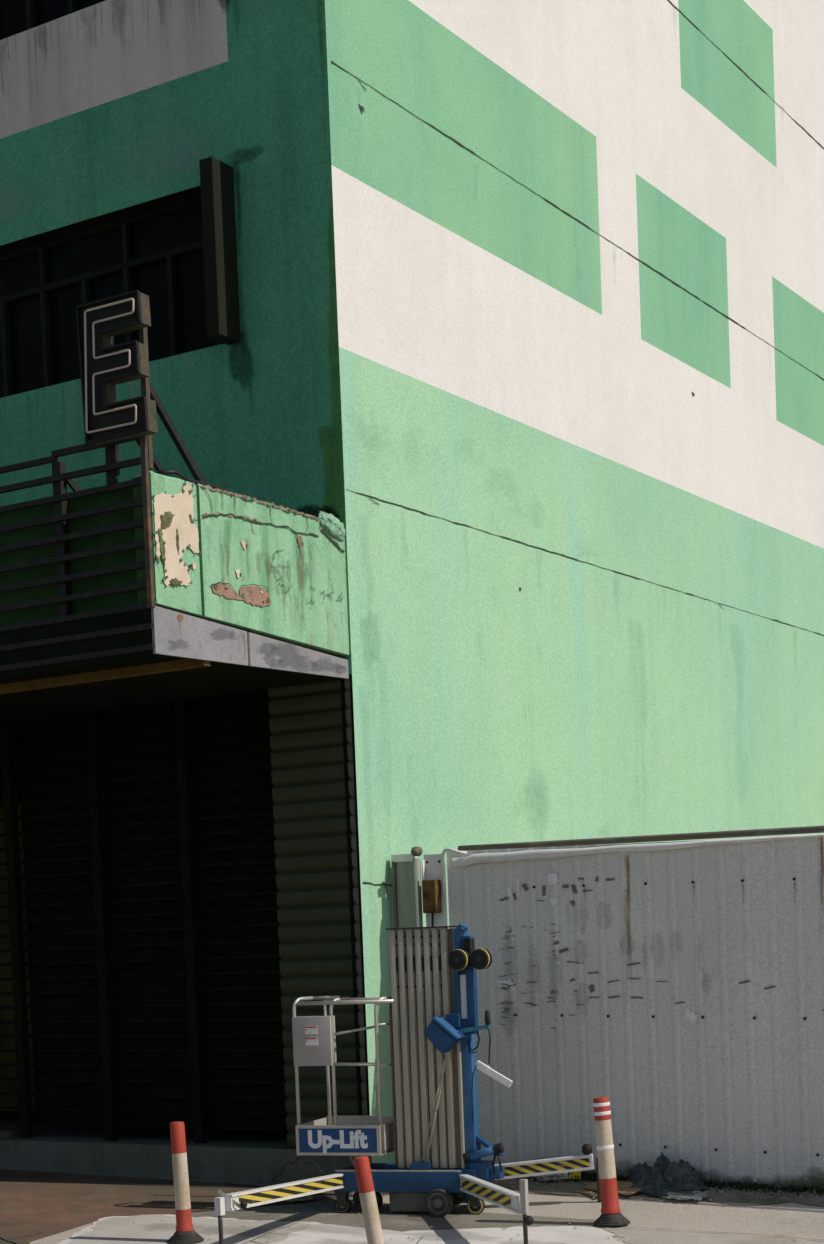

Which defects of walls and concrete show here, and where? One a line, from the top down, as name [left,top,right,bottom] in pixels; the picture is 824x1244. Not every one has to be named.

peeling [153,481,319,587]
spalling [211,569,271,607]